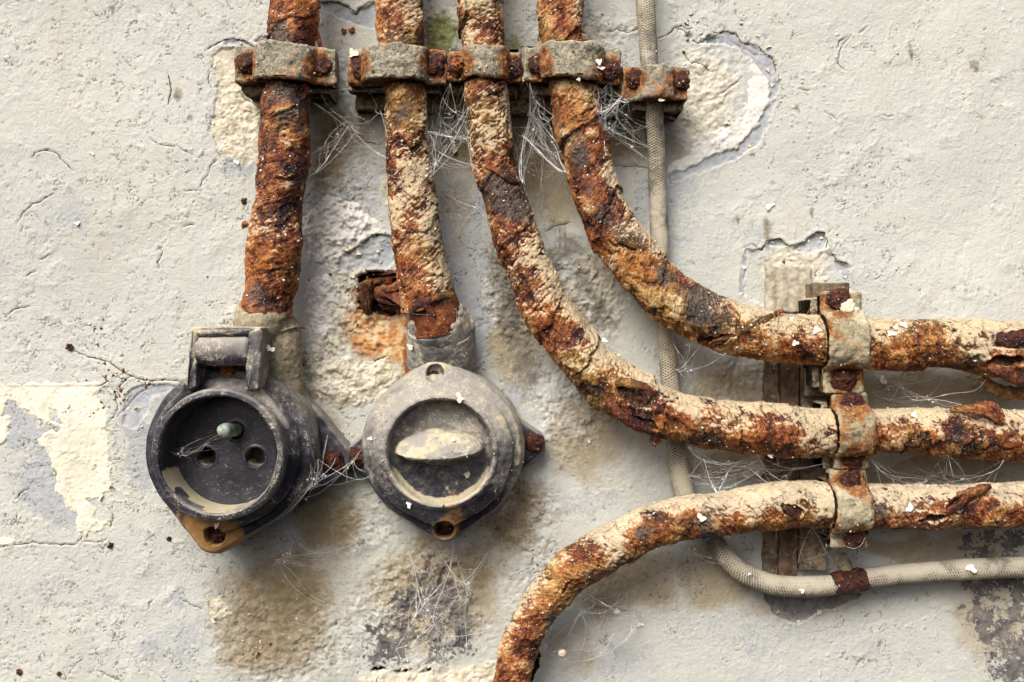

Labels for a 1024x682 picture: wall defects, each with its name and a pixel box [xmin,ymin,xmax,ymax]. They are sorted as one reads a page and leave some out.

flaking render [208,37,266,166]
peeling [667,33,781,184]
flaking render [767,234,826,253]
corrosion [343,288,410,376]
peeling [0,380,115,537]
leakage [957,529,1024,558]
leakage [958,578,1024,682]